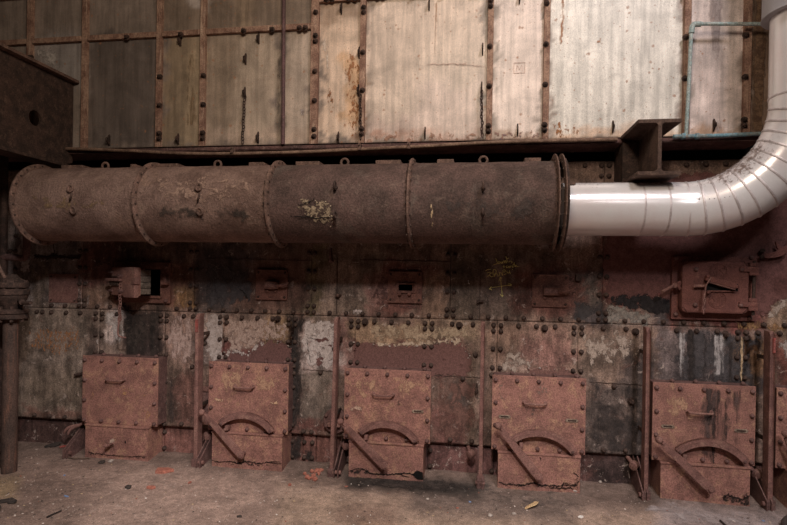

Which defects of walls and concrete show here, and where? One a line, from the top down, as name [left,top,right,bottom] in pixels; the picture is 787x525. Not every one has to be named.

rust [346,54,359,136]
peeling [667,171,720,182]
peeling [583,199,787,366]
peeling [205,314,293,362]
peeling [300,321,340,370]
peeling [352,322,474,377]
damp [675,330,761,463]